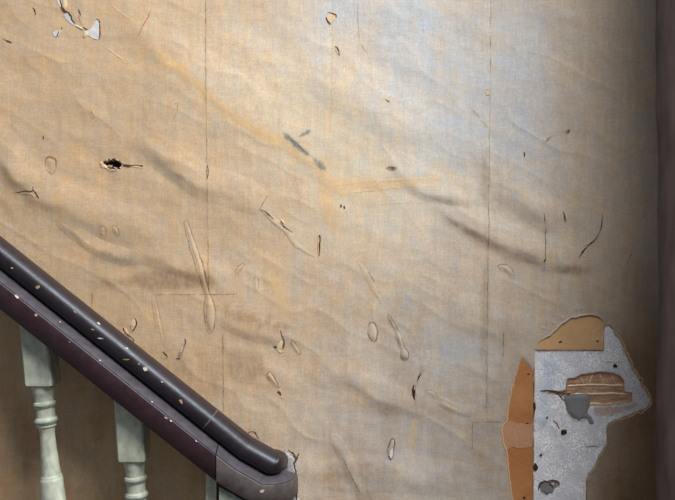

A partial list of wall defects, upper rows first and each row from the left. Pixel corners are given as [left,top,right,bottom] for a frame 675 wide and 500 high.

flaking render [83,19,101,40]
crack [315,235,323,256]
crack [579,214,603,258]
peeling [501,305,653,500]